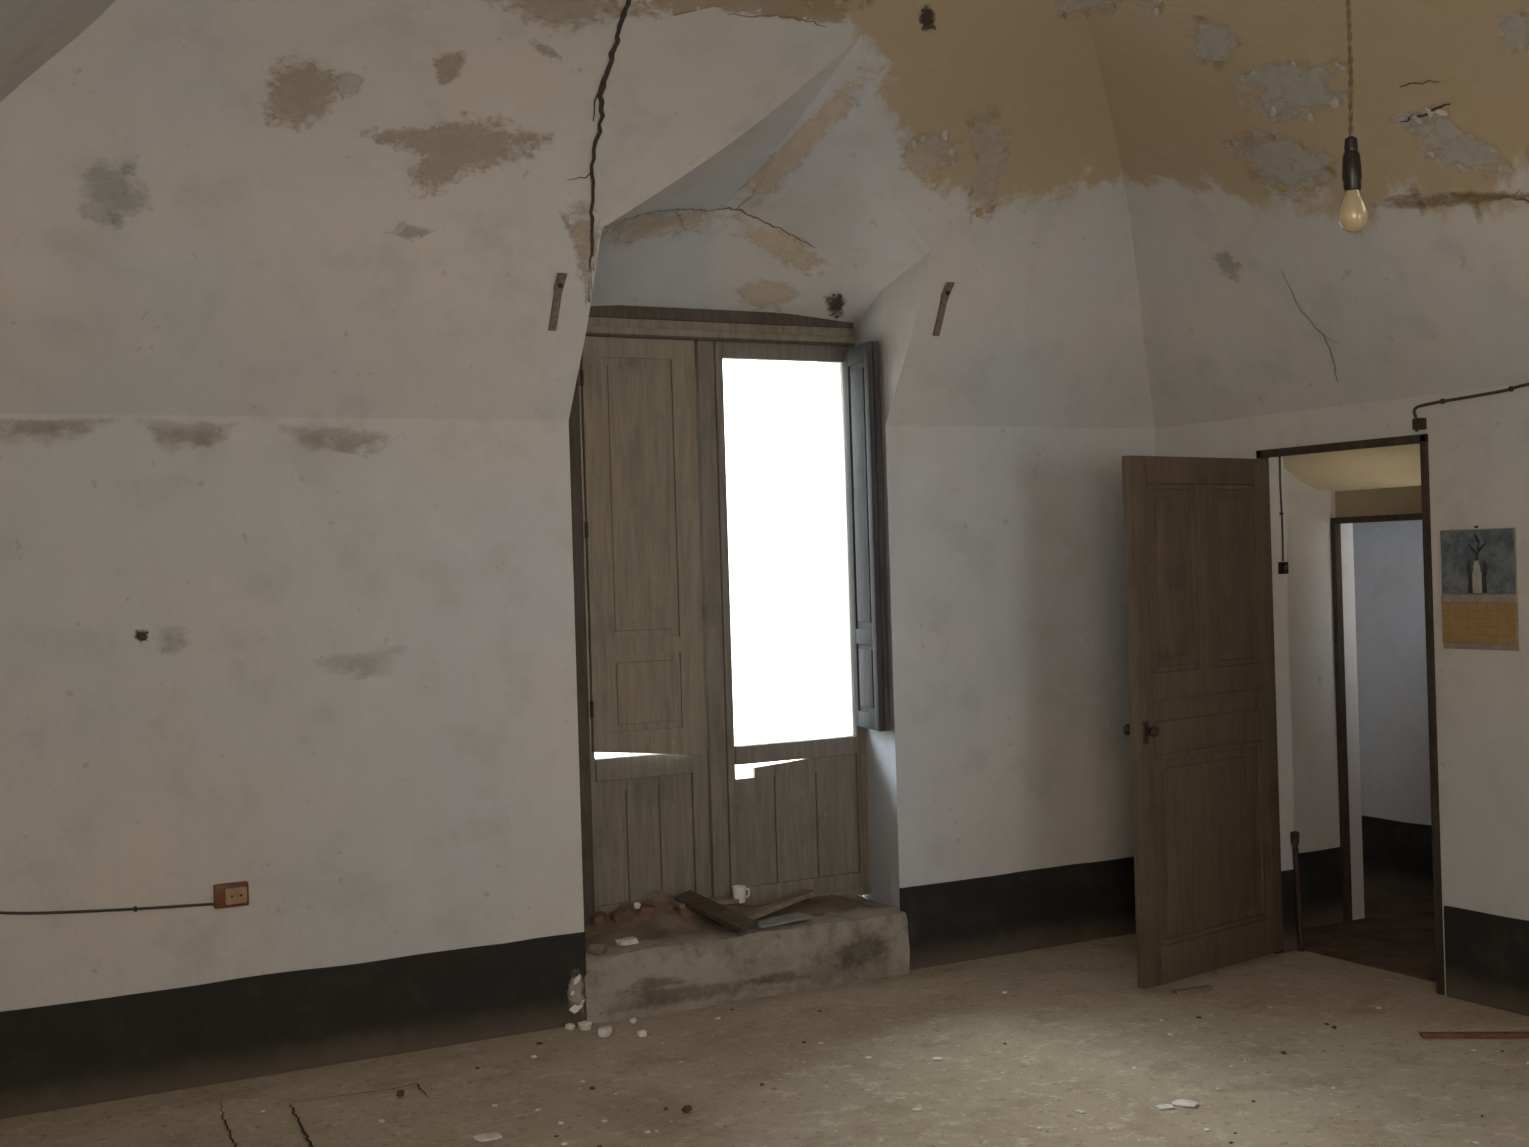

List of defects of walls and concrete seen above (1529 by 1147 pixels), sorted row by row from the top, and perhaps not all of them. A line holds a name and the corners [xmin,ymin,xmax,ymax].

peeling [607,0,847,23]
flaking render [919,5,936,31]
crack [567,0,826,271]
flaking render [826,294,844,319]